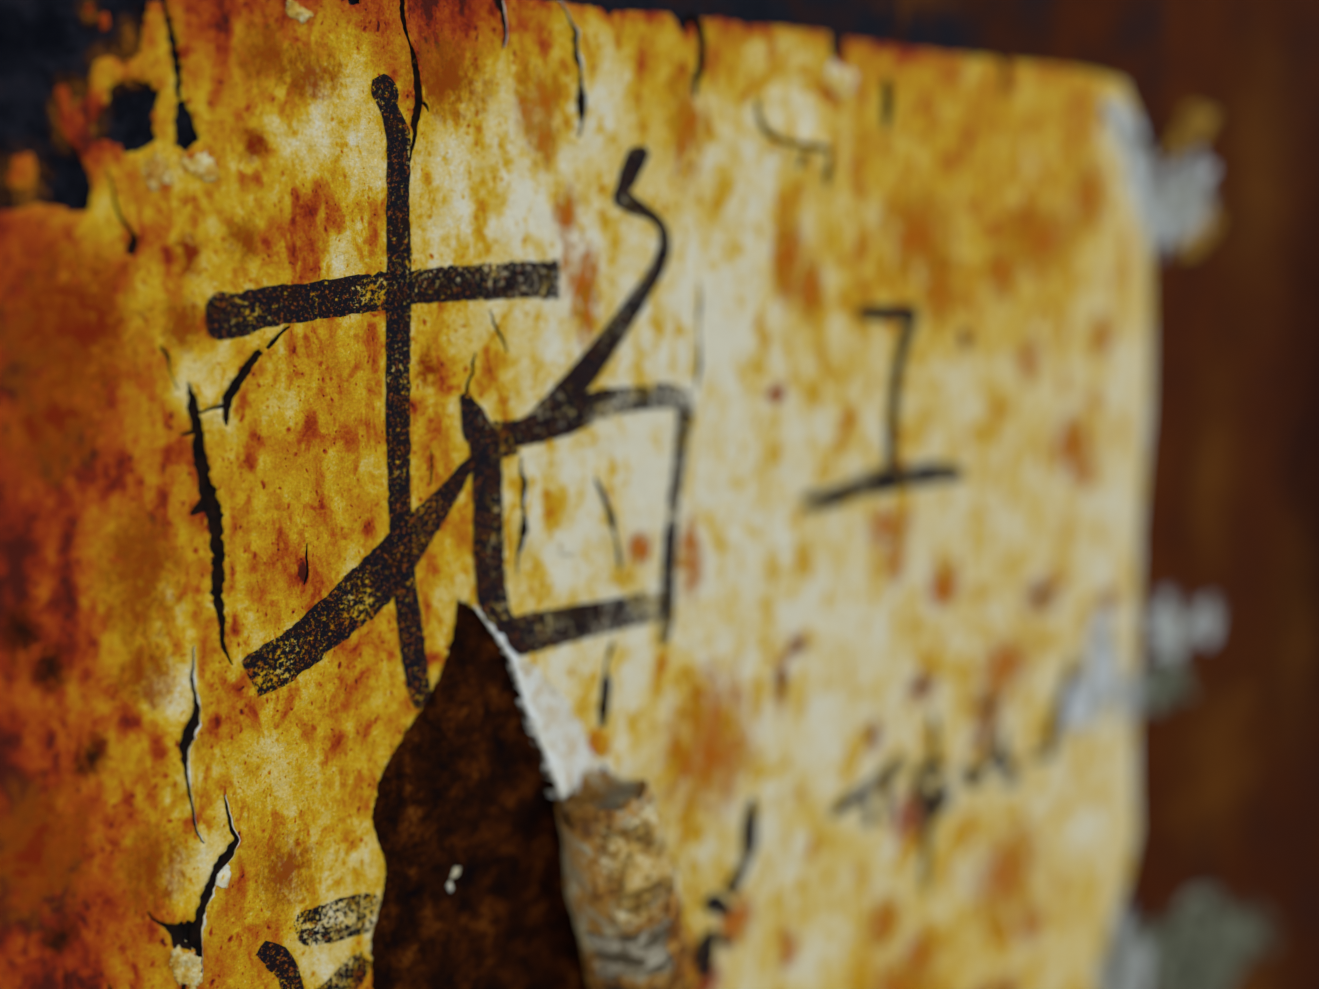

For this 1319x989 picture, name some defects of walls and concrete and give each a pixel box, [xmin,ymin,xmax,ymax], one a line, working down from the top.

peeling [0,0,220,213]
crack [399,0,429,162]
rust [516,63,561,164]
crack [556,0,588,138]
rust [174,234,202,274]
rust [554,193,598,339]
rust [772,219,824,319]
rust [628,531,651,565]
crack [147,326,290,989]
peeling [587,727,611,759]
rust [258,836,310,906]
peeling [447,867,460,893]